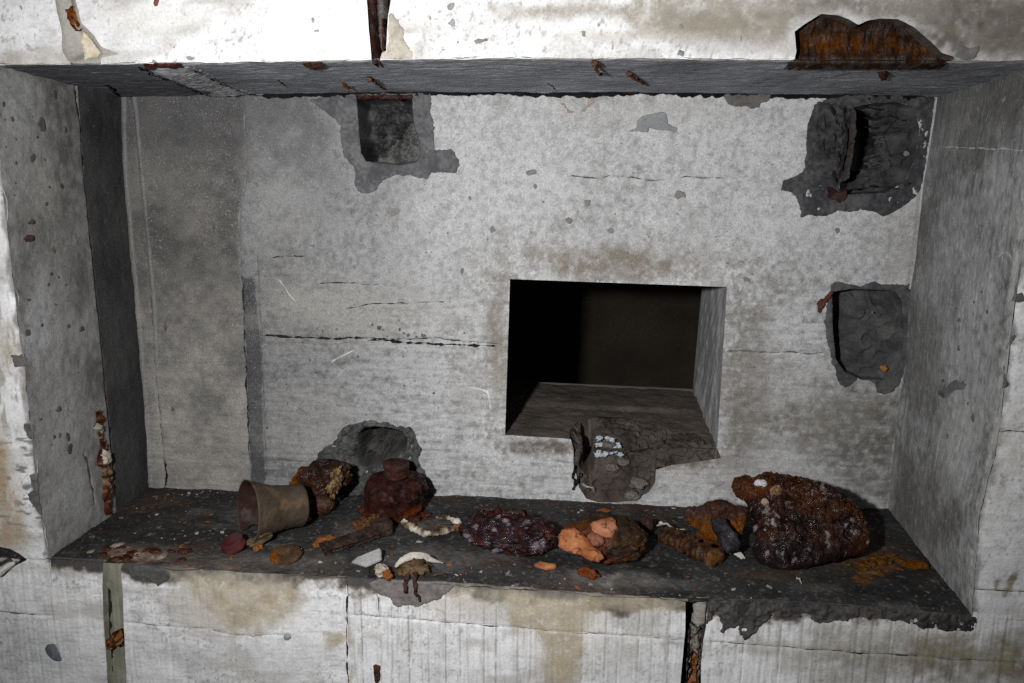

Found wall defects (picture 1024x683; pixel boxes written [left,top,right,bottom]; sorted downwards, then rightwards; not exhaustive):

spalling [310,92,460,194]
peeling [629,112,678,133]
spalling [781,95,934,218]
crack [238,80,923,471]
spalling [817,268,910,395]
spalling [316,420,431,496]